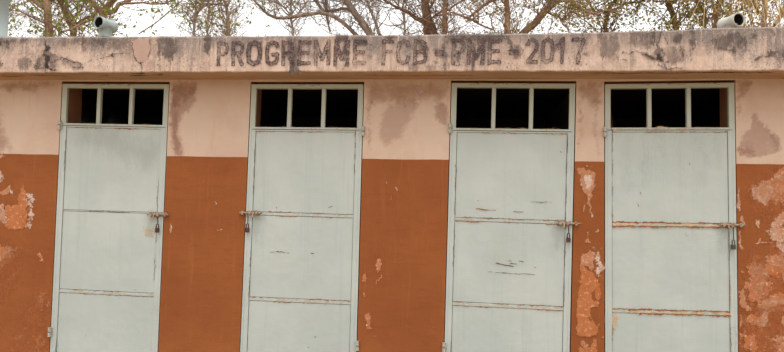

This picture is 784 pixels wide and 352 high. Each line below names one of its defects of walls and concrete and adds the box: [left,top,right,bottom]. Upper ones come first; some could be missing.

spalling [130,37,152,62]
damp [157,38,175,58]
damp [335,33,350,67]
damp [422,30,524,71]
damp [661,25,696,70]
damp [713,32,757,52]
peeling [0,171,37,230]
peeling [576,165,596,217]
rust [612,214,731,261]
peeling [736,167,784,352]
peeling [575,230,607,352]
rust [612,289,731,340]